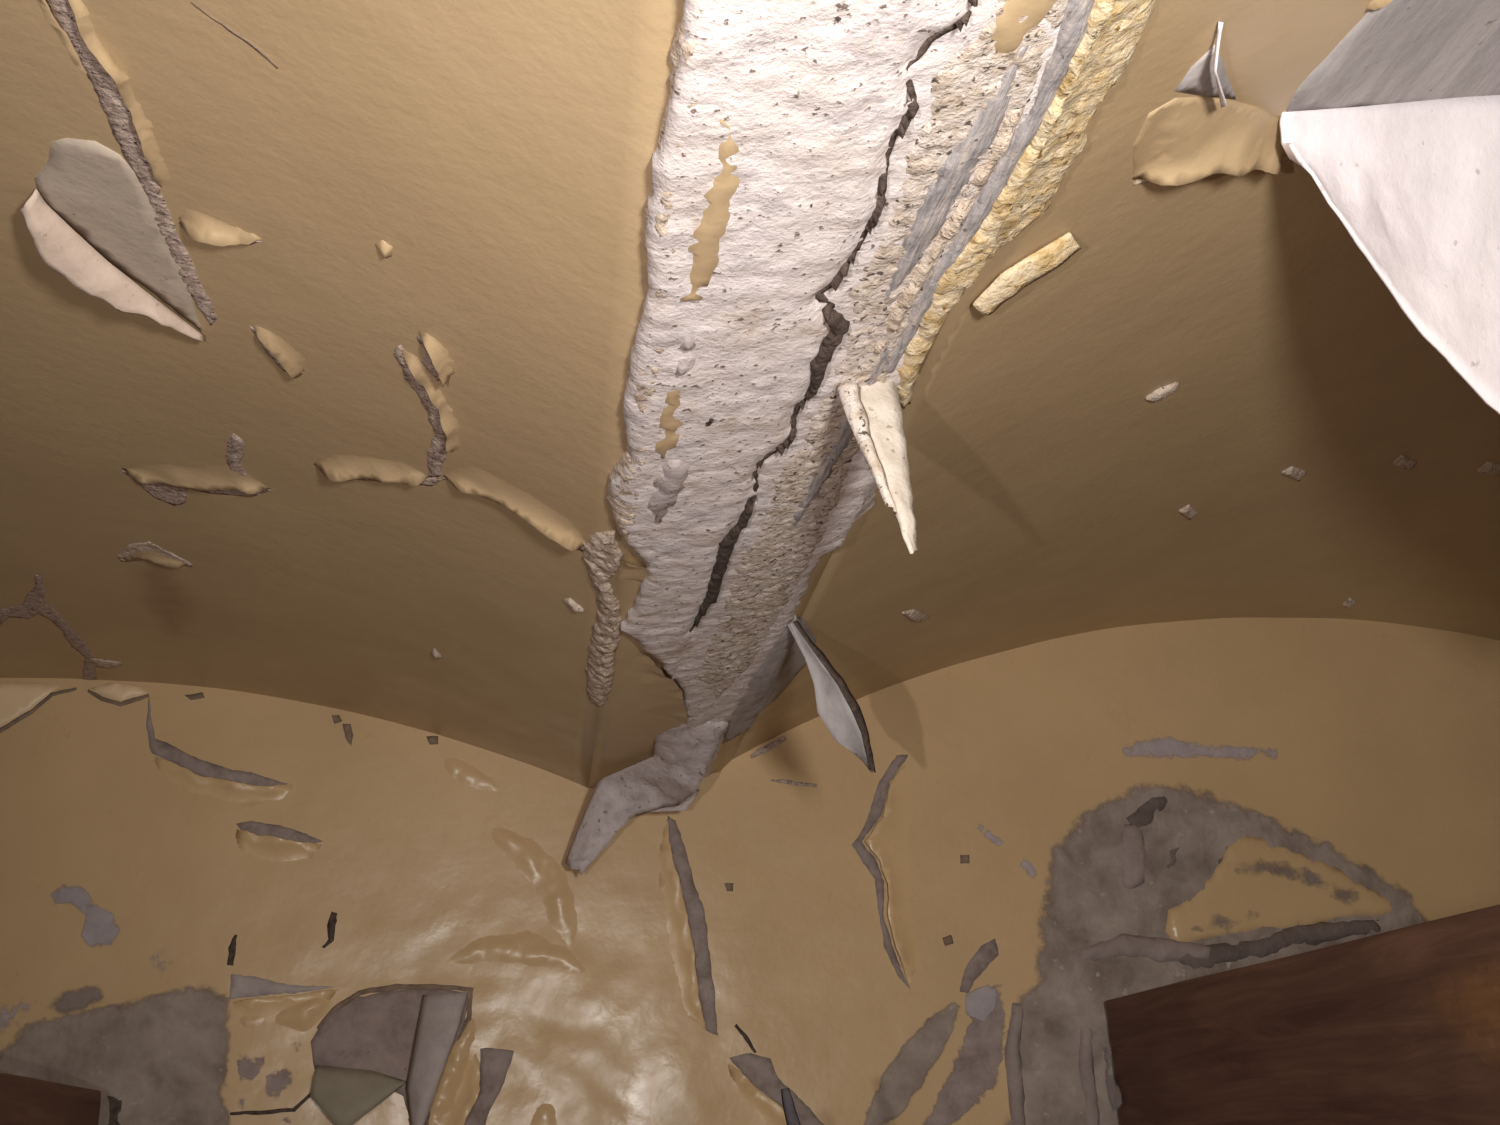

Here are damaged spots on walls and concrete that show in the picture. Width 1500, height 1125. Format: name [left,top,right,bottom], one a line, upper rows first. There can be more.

peeling [20,138,204,342]
crack [37,0,217,325]
peeling [1132,0,1500,415]
flaking render [563,0,1156,989]
peeling [1281,466,1306,481]
peeling [0,682,322,861]
spalling [1126,796,1168,828]
peeling [659,816,718,1035]
peeling [227,935,474,1125]
peeling [447,1048,514,1125]
peeling [728,1053,824,1125]
peeling [865,938,1005,1125]